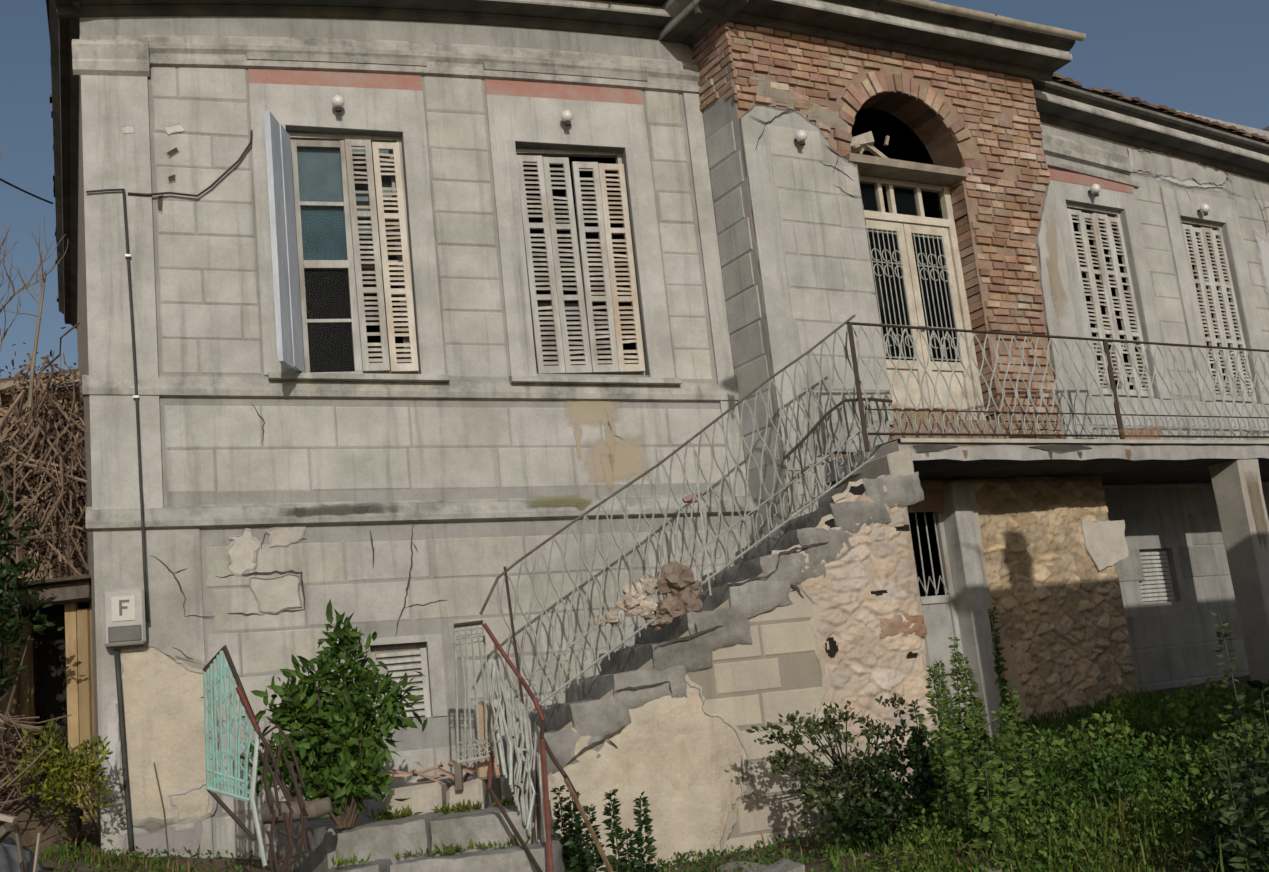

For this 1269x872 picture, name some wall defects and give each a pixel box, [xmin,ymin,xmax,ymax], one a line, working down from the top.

crack [751,109,796,152]
crack [823,144,860,199]
damp [568,400,647,488]
crack [150,532,305,617]
flaking render [226,525,307,614]
crack [395,523,445,637]
damp [531,496,590,510]
flaking render [1079,520,1128,571]
flaking render [993,611,1030,722]
flaking render [115,641,219,833]